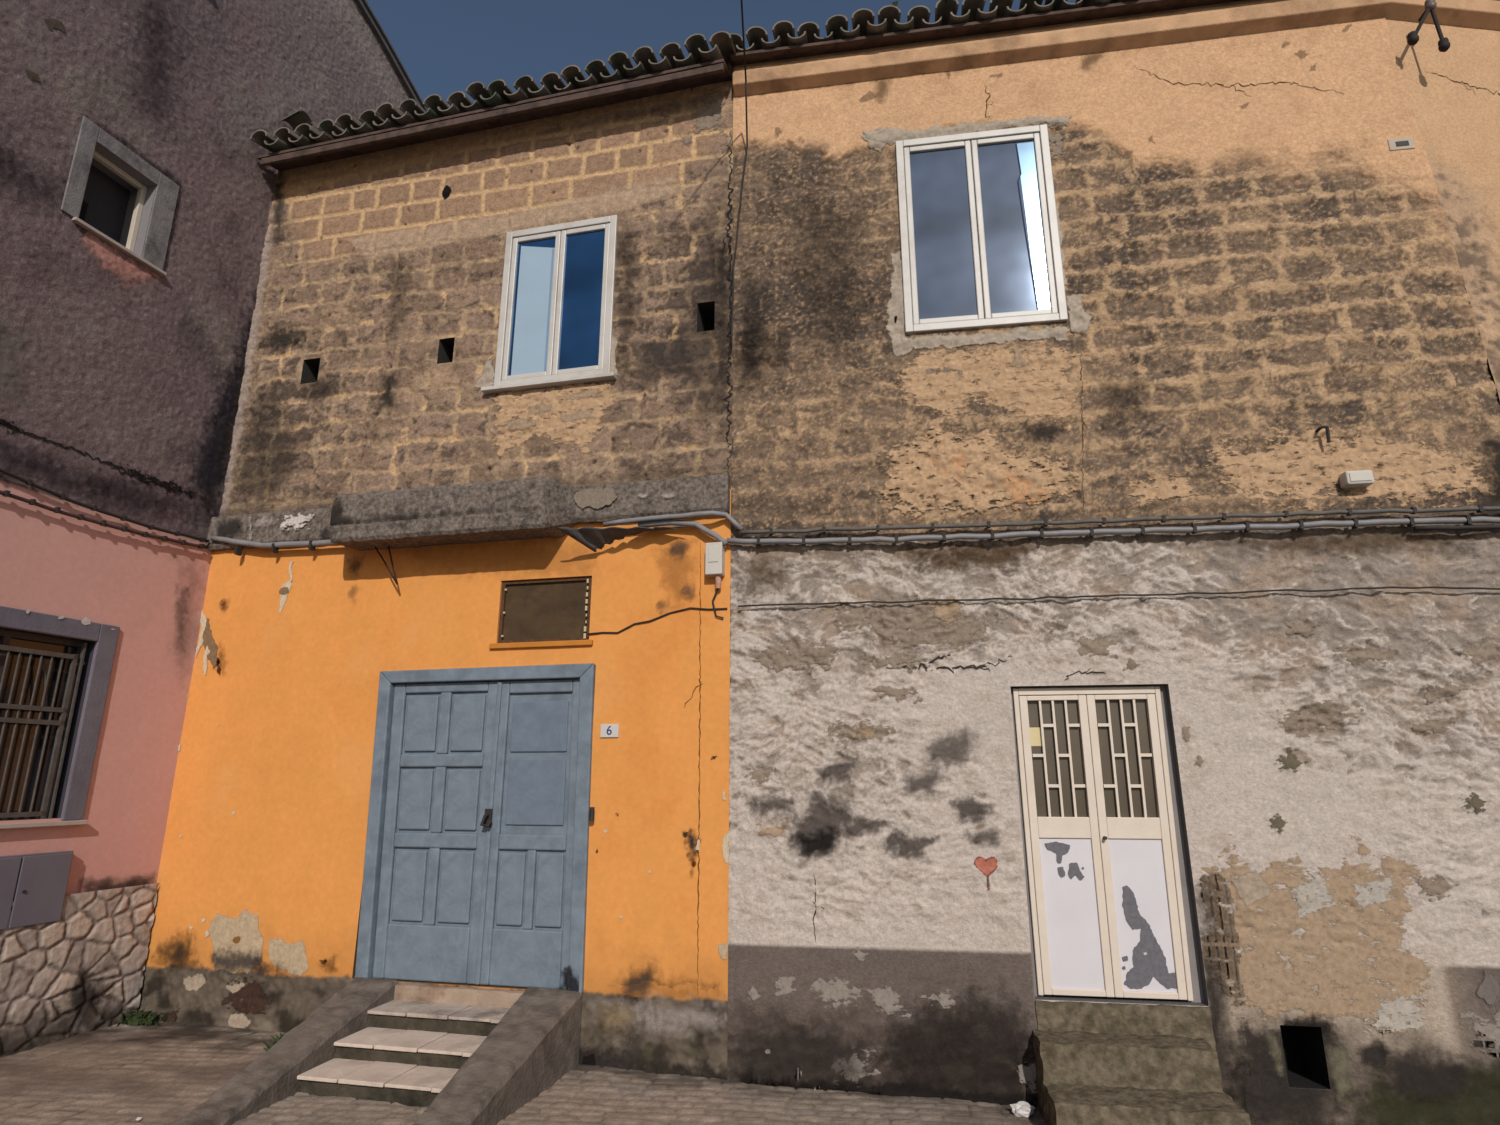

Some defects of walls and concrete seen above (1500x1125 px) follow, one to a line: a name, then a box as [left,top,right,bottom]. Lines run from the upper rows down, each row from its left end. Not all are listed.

crack [1135,66,1345,96]
crack [1424,70,1500,95]
crack [0,419,196,502]
peeling [195,600,226,675]
crack [886,654,1012,673]
leakage [910,730,968,792]
leakage [749,762,935,857]
leakage [953,798,998,844]
flaking render [1197,834,1459,1036]
peeling [183,909,333,1028]
peeling [746,974,911,1019]
leakage [879,1082,1020,1105]